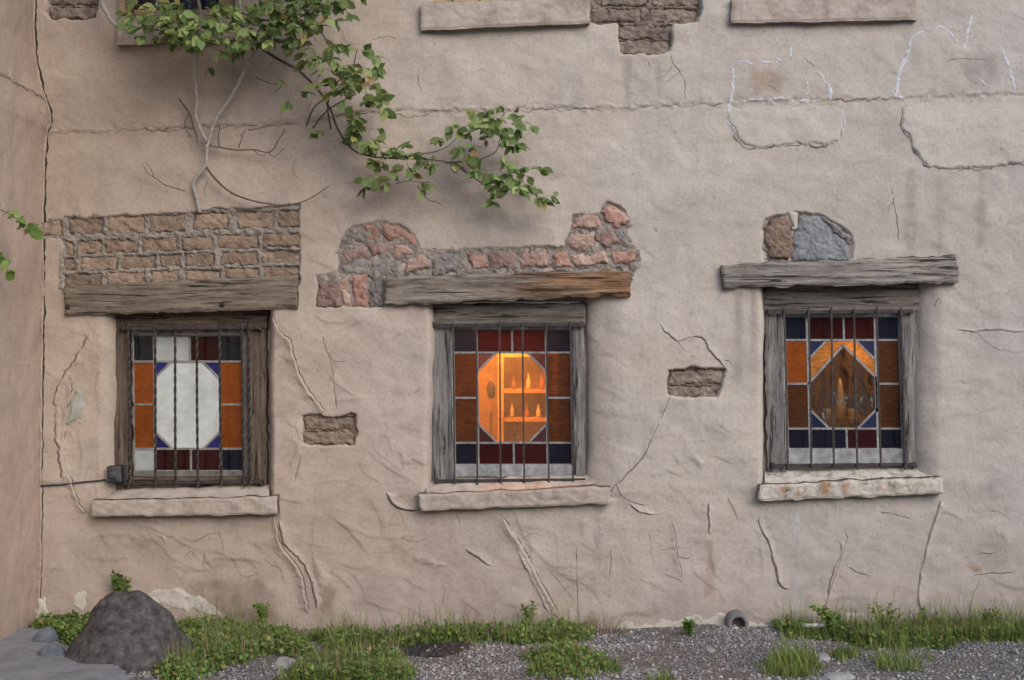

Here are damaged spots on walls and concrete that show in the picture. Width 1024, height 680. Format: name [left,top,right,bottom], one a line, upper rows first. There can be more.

flaking render [590,0,700,55]
crack [831,96,1024,171]
flaking render [42,204,301,295]
flaking render [315,202,641,308]
flaking render [762,212,853,263]
crack [0,0,842,619]
flaking render [666,367,725,398]
flaking render [303,413,358,446]
crack [827,531,867,600]
crack [881,499,948,611]